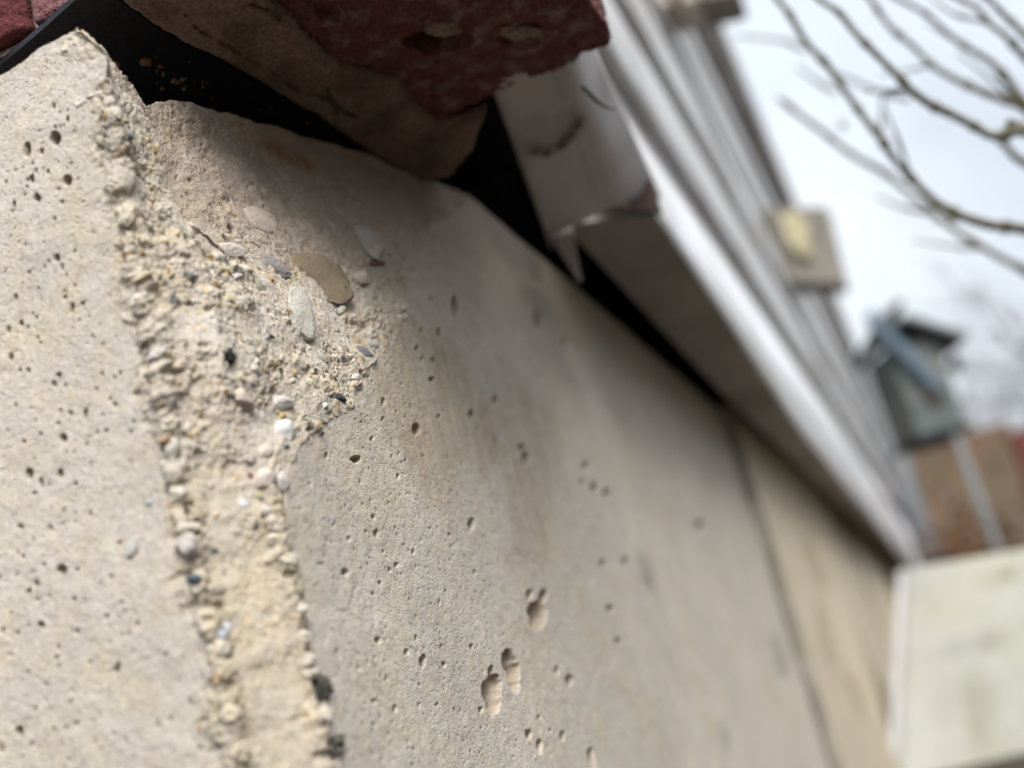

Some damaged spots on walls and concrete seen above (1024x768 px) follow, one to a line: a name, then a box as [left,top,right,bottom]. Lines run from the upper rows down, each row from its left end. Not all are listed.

spalling [56,27,472,768]